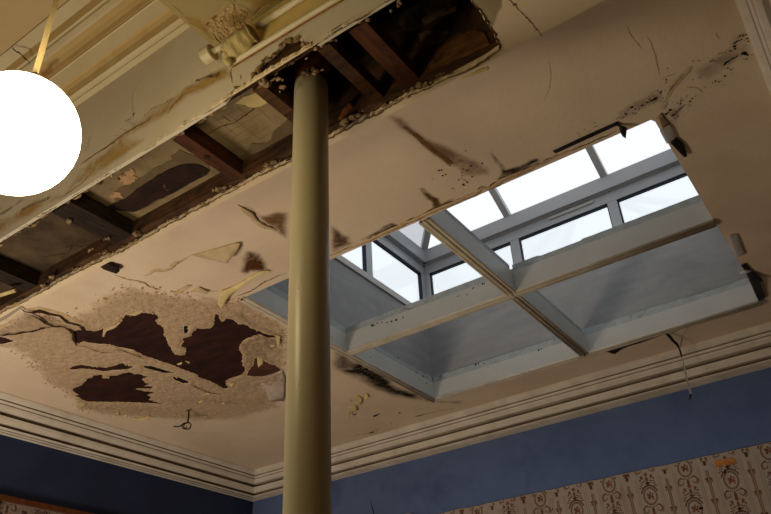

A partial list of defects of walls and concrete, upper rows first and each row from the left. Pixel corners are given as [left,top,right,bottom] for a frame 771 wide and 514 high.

spalling [190,0,403,123]
spalling [328,0,502,139]
mould [616,79,693,121]
crack [628,29,703,95]
mould [693,33,753,88]
damp [16,70,226,219]
damp [404,126,461,176]
damp [502,159,537,175]
spalling [0,155,292,314]
peeling [0,270,287,420]
damp [346,364,412,397]